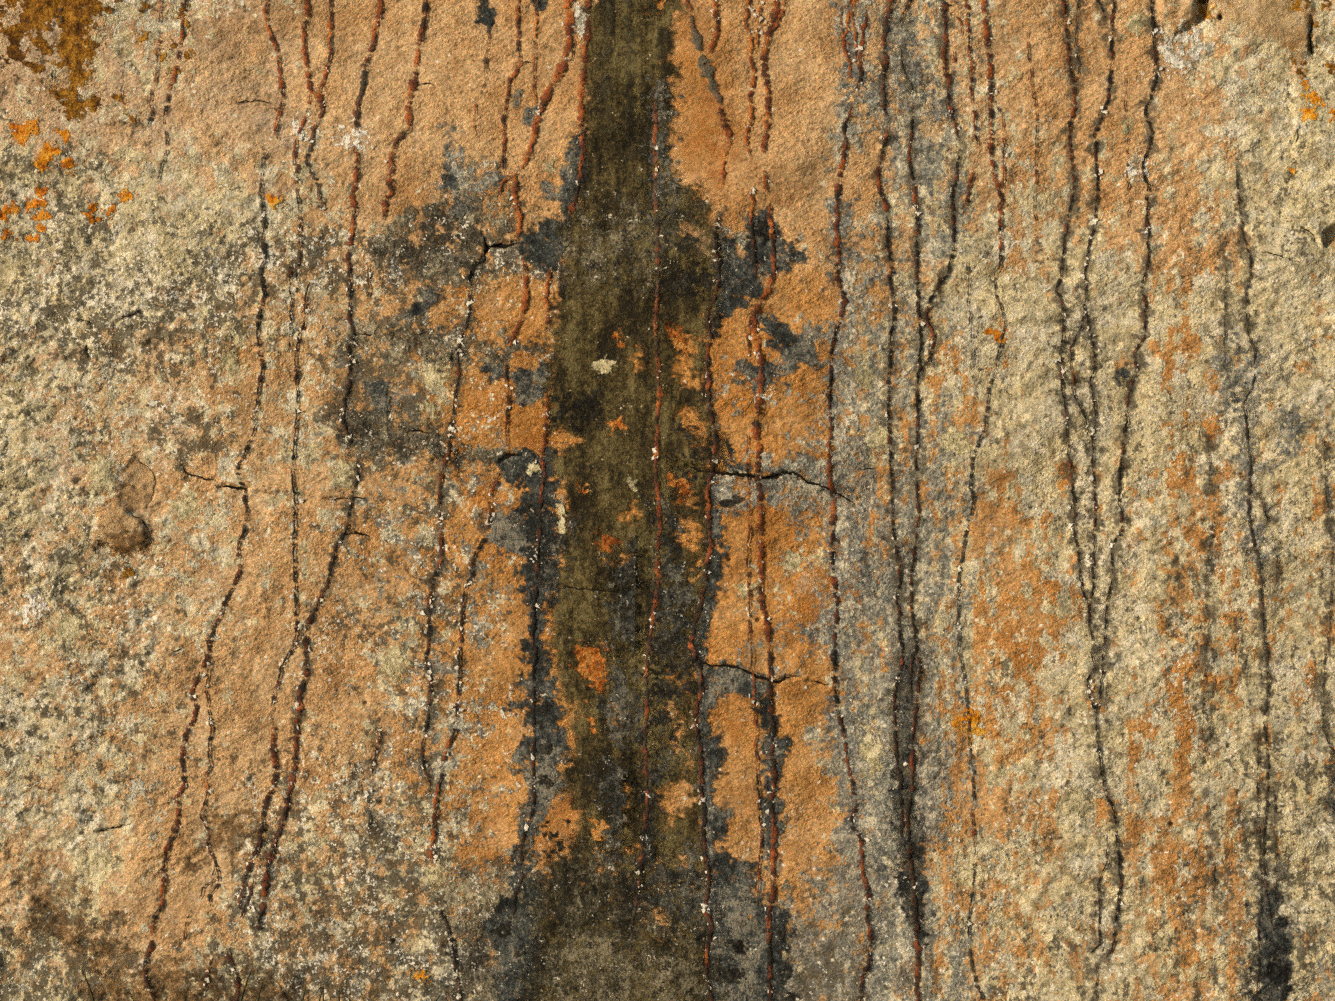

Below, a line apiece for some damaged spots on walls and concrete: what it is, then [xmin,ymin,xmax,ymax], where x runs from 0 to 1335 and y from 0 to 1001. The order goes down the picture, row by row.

rust [381,0,429,219]
rust [492,0,593,240]
rust [685,0,785,184]
rust [503,257,551,446]
crack [121,459,266,532]
leakage [179,0,972,1001]
rust [742,170,782,1001]
crack [698,659,826,685]
crack [688,465,853,503]